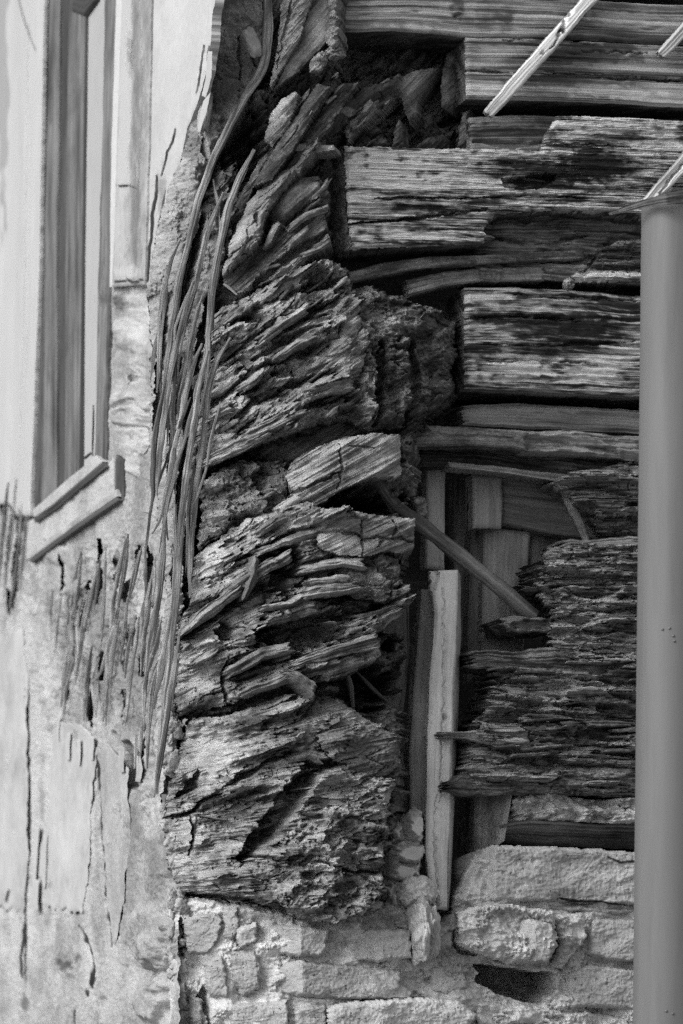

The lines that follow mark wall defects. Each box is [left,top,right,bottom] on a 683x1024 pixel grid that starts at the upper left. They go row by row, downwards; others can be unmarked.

crack [196,45,209,91]
spalling [197,51,213,137]
crack [2,689,31,981]